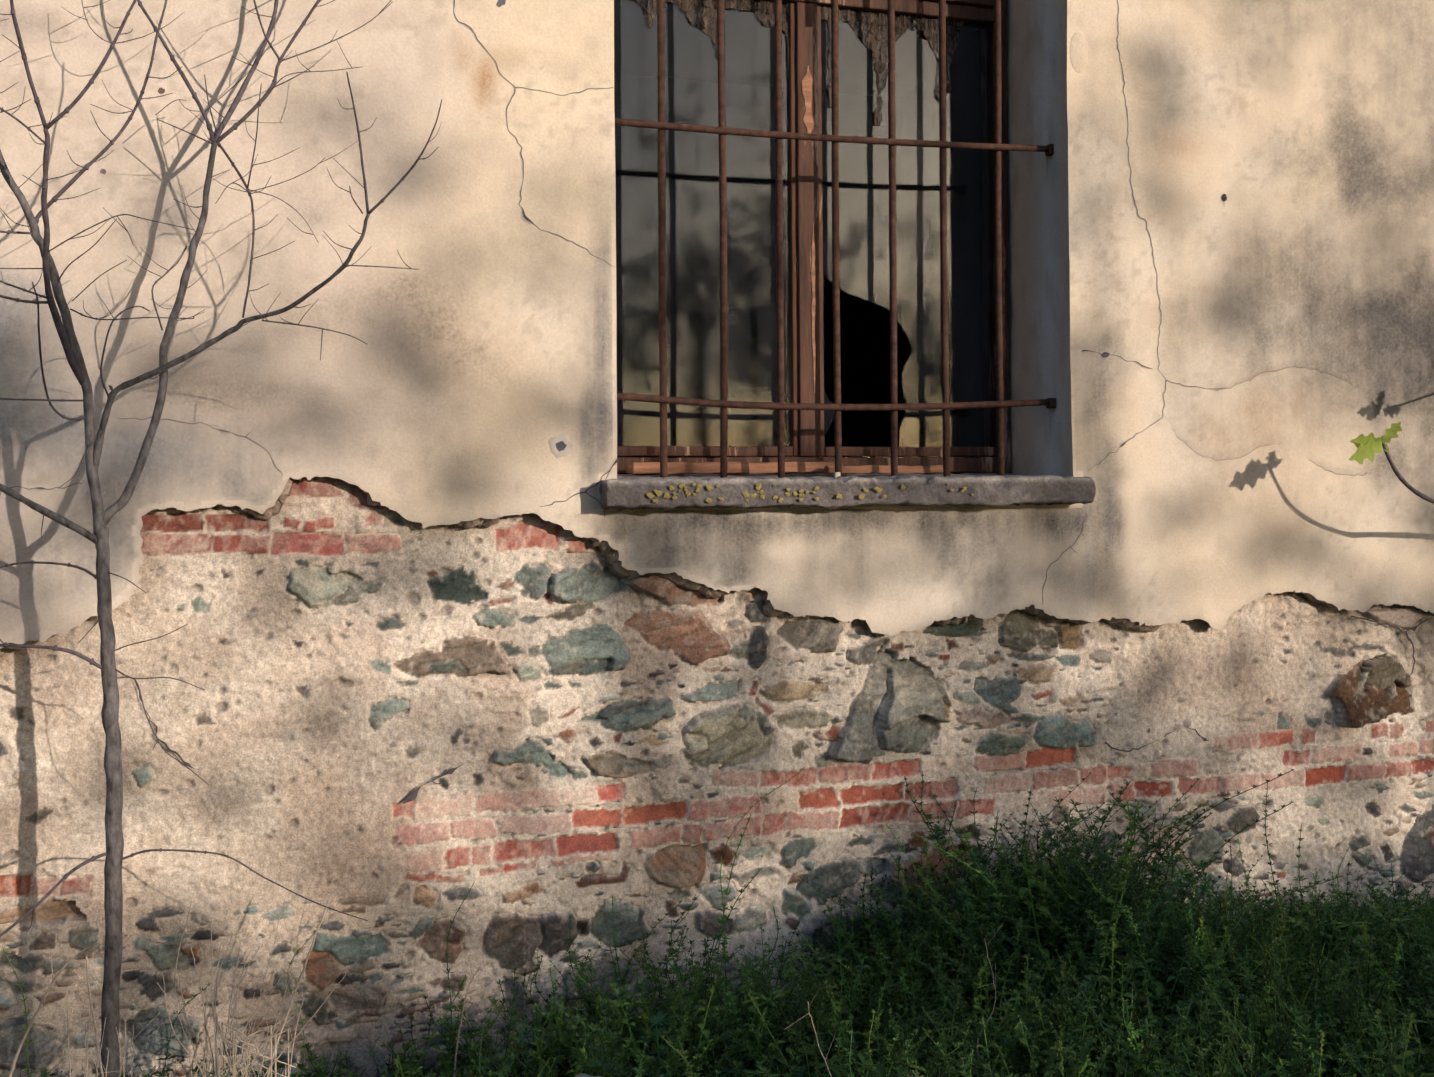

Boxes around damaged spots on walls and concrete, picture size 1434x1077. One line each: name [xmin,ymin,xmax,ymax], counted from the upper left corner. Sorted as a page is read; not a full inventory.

crack [452,0,616,268]
crack [1082,0,1226,471]
water stain [1370,298,1434,404]
crack [1042,514,1087,602]
spalling [0,476,1434,1077]